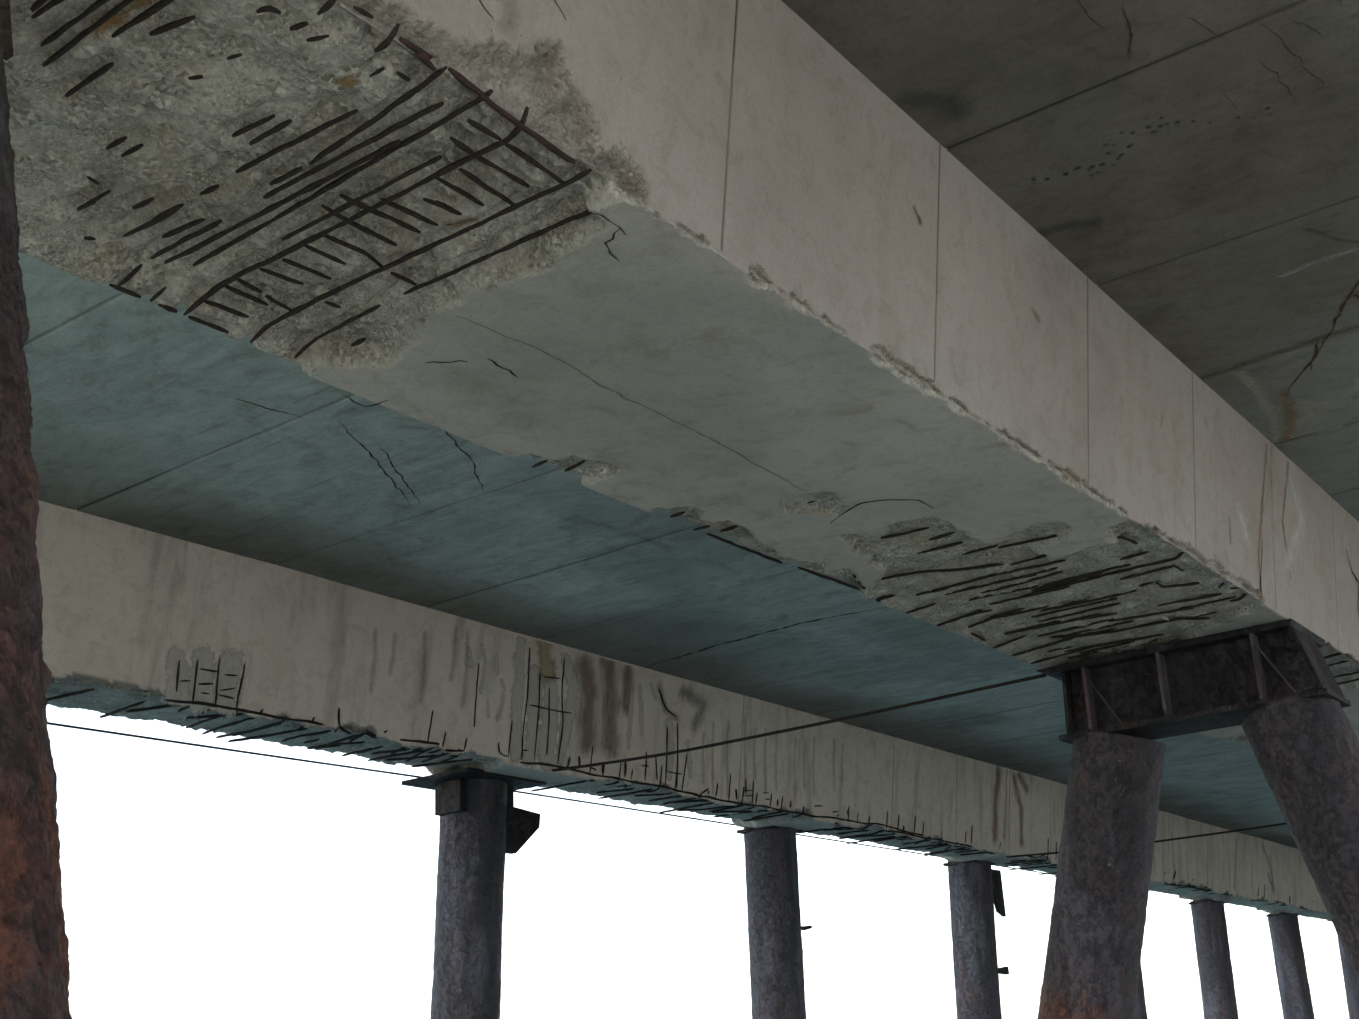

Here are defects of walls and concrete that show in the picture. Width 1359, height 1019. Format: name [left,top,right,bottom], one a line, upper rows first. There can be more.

crack [1077,0,1133,62]
crack [1259,21,1325,97]
spalling [3,0,729,378]
crack [1286,281,1359,397]
crack [342,395,420,505]
spalling [516,452,626,487]
spalling [648,259,1268,669]
spalling [45,637,1058,877]
water stain [579,659,632,753]
spalling [1313,632,1359,691]